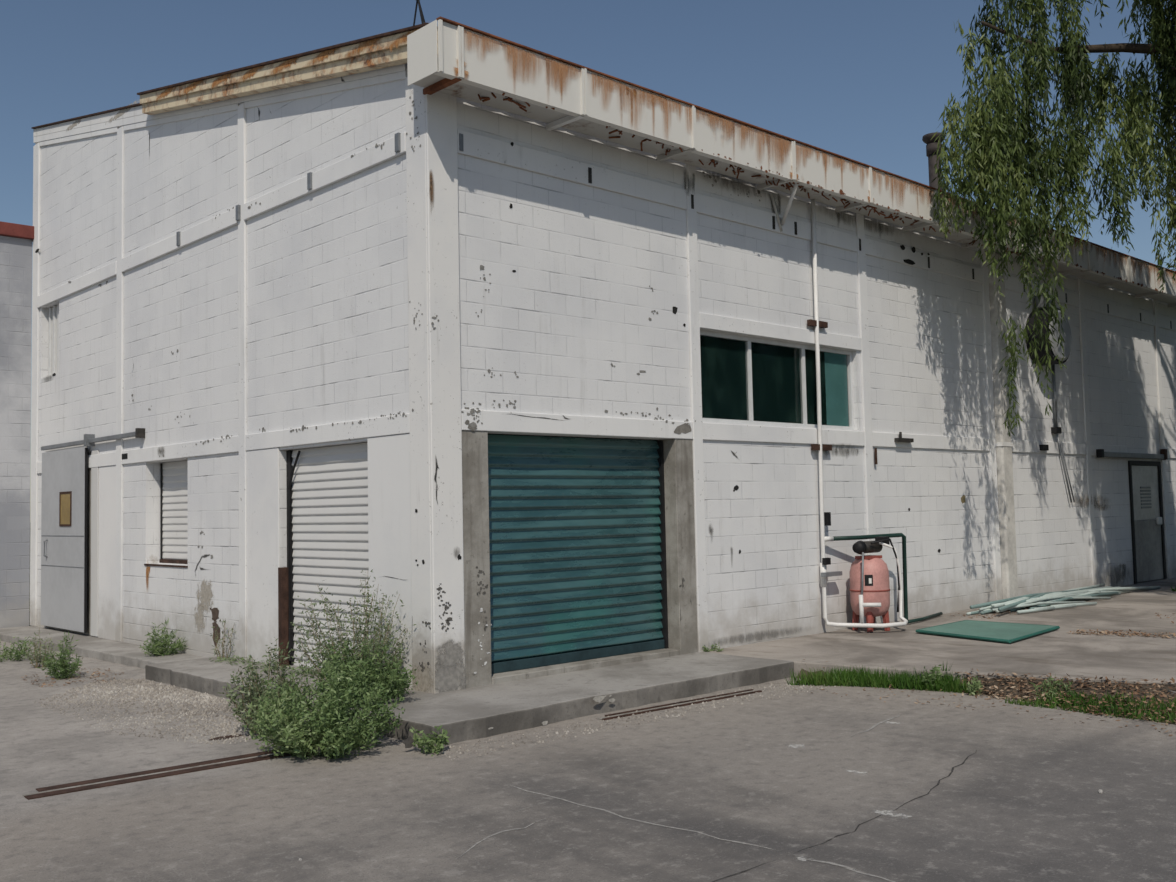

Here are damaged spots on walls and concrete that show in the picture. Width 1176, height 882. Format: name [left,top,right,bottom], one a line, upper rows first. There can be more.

corrosion [157,57,298,99]
corrosion [313,28,420,63]
corrosion [467,31,577,94]
corrosion [592,74,1018,248]
peeling [461,400,516,431]
spalling [605,407,696,434]
peeling [195,604,221,631]
peeling [419,566,492,693]
crack [460,750,977,882]